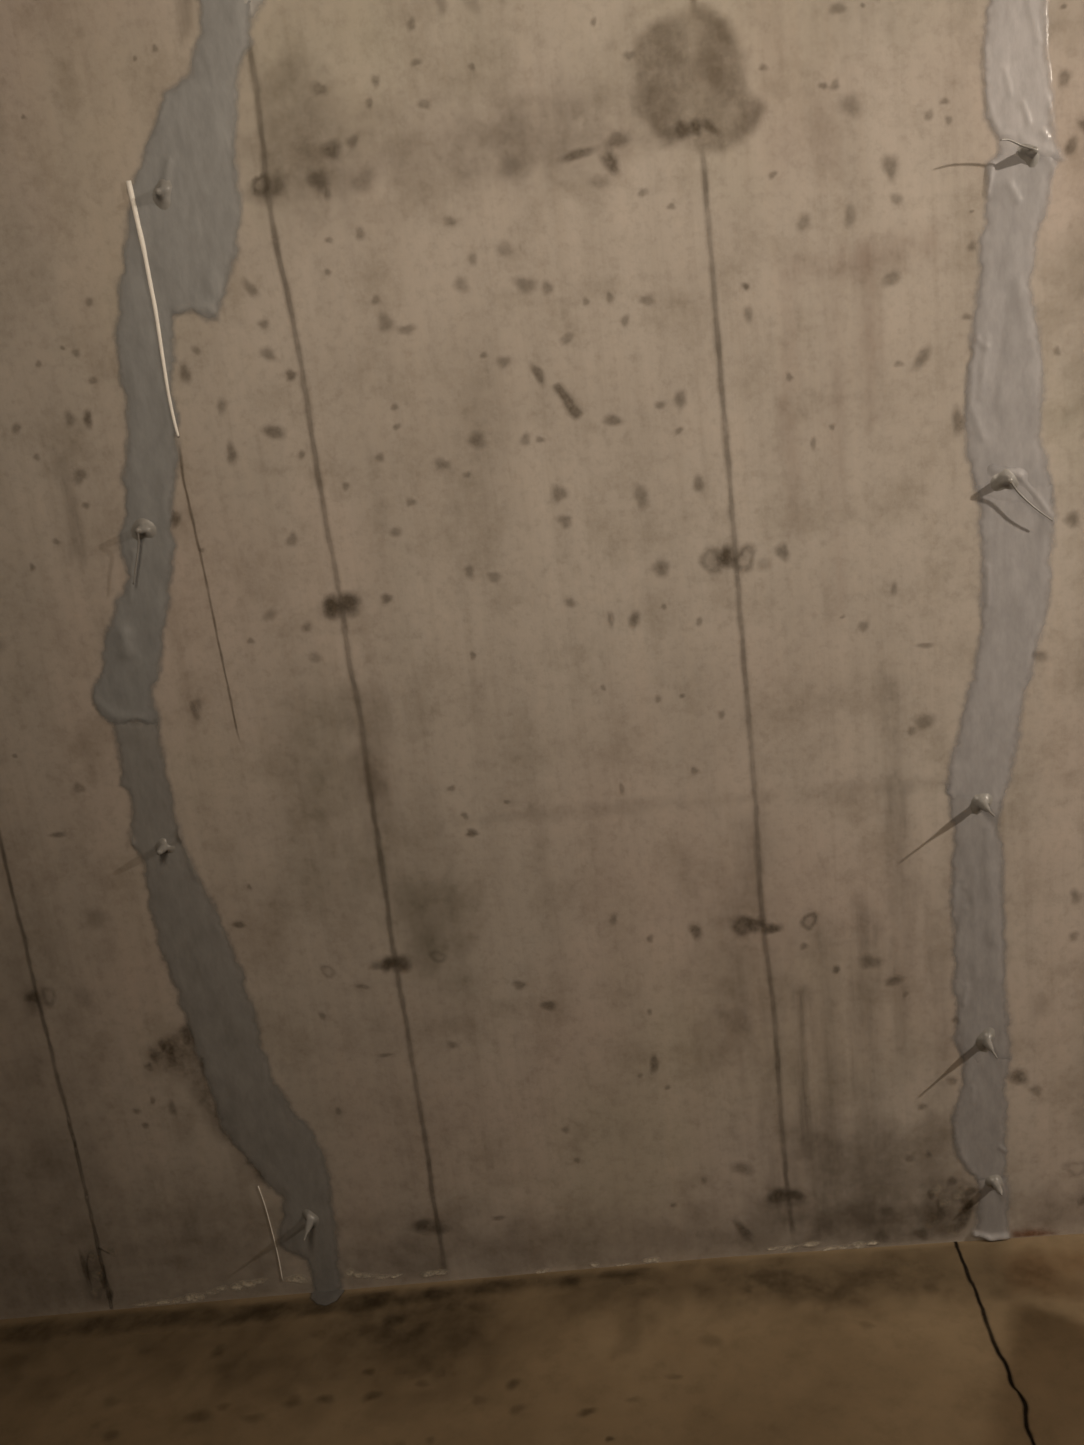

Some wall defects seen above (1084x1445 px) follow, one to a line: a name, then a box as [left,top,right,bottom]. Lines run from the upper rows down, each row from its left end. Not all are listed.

crack [93,0,344,1306]
crack [947,0,1059,1445]